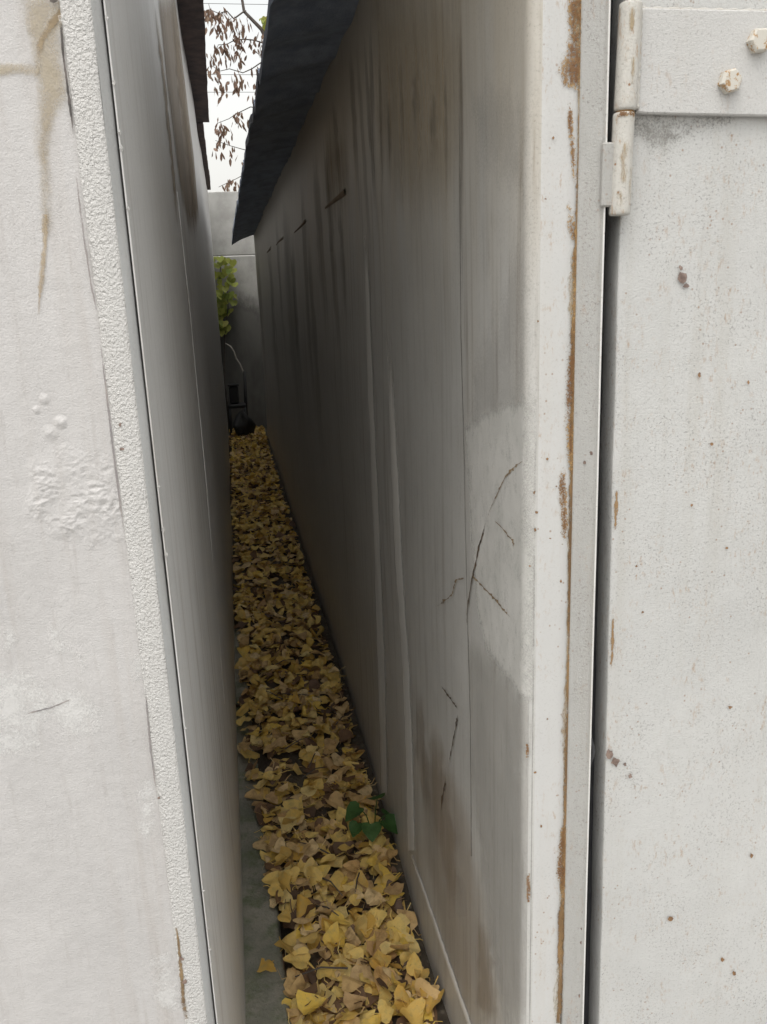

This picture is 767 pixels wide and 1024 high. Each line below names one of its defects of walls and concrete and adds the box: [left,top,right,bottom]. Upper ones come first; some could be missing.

leakage [0,0,64,132]
leakage [38,214,48,301]
crack [441,462,521,621]
rust [549,0,581,1023]
crack [441,687,458,808]
rust [606,749,632,778]